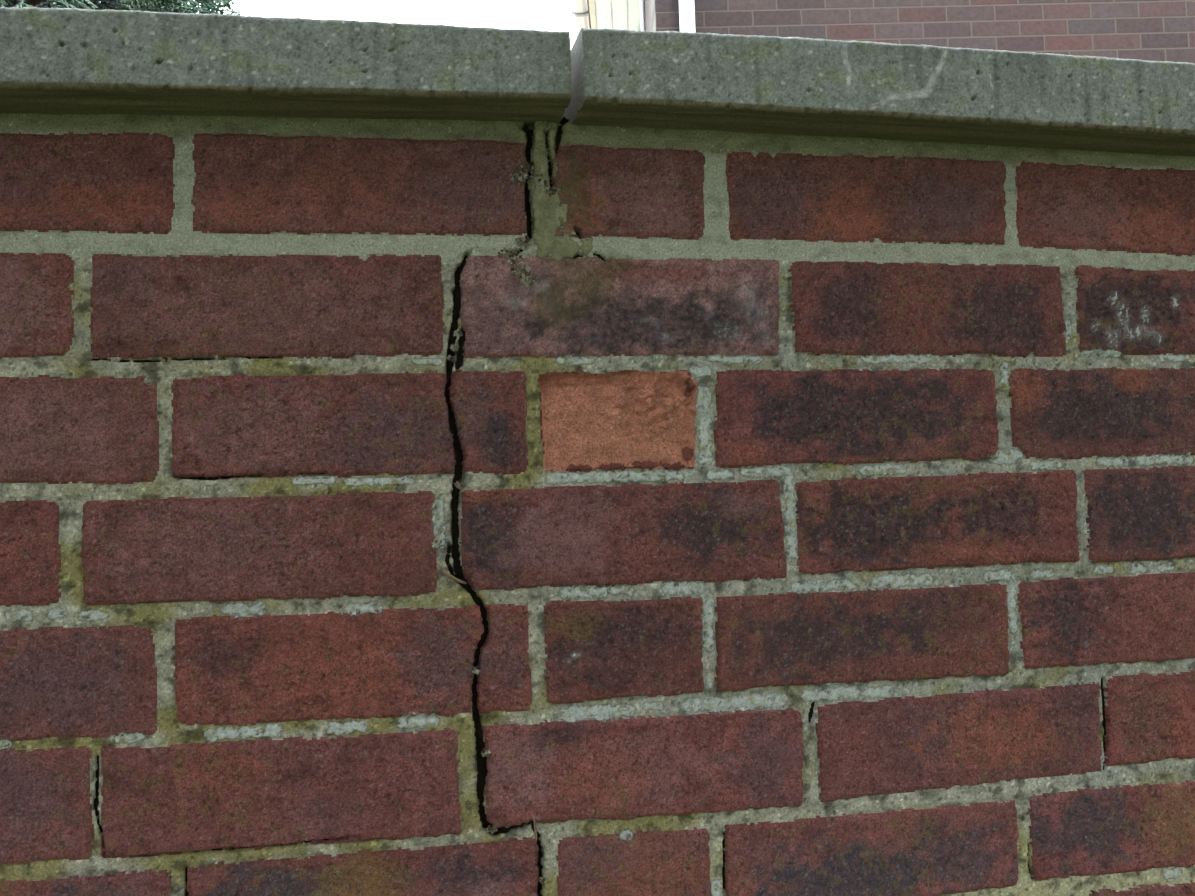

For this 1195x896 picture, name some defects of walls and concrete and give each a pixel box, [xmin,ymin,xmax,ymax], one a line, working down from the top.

crack [520,116,570,252]
crack [444,255,543,896]